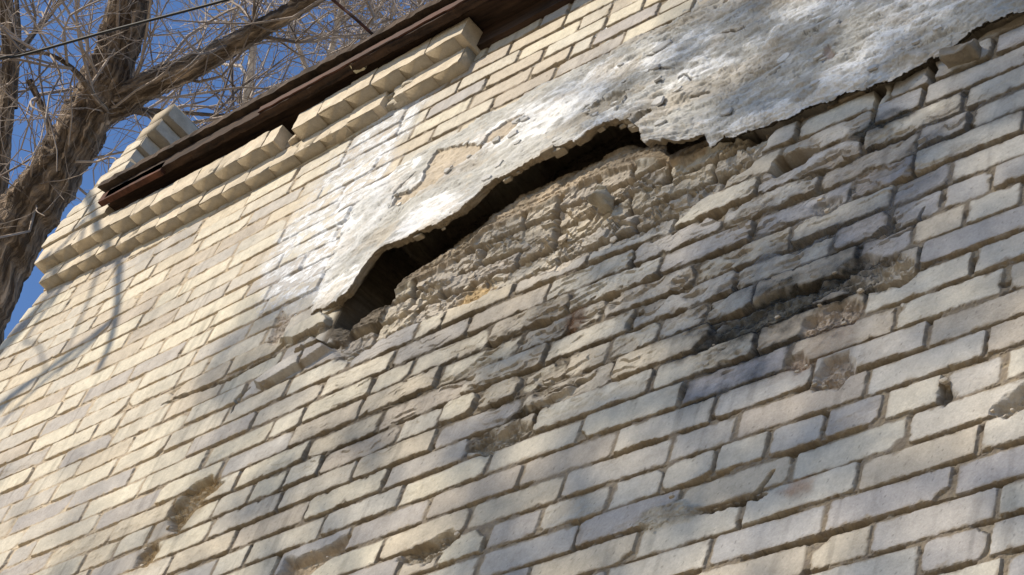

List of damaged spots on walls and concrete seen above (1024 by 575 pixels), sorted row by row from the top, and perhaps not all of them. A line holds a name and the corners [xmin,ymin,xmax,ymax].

peeling [310,0,1024,363]
leakage [755,221,846,263]
spalling [787,353,858,392]
spalling [990,385,1024,419]
spalling [166,477,225,535]